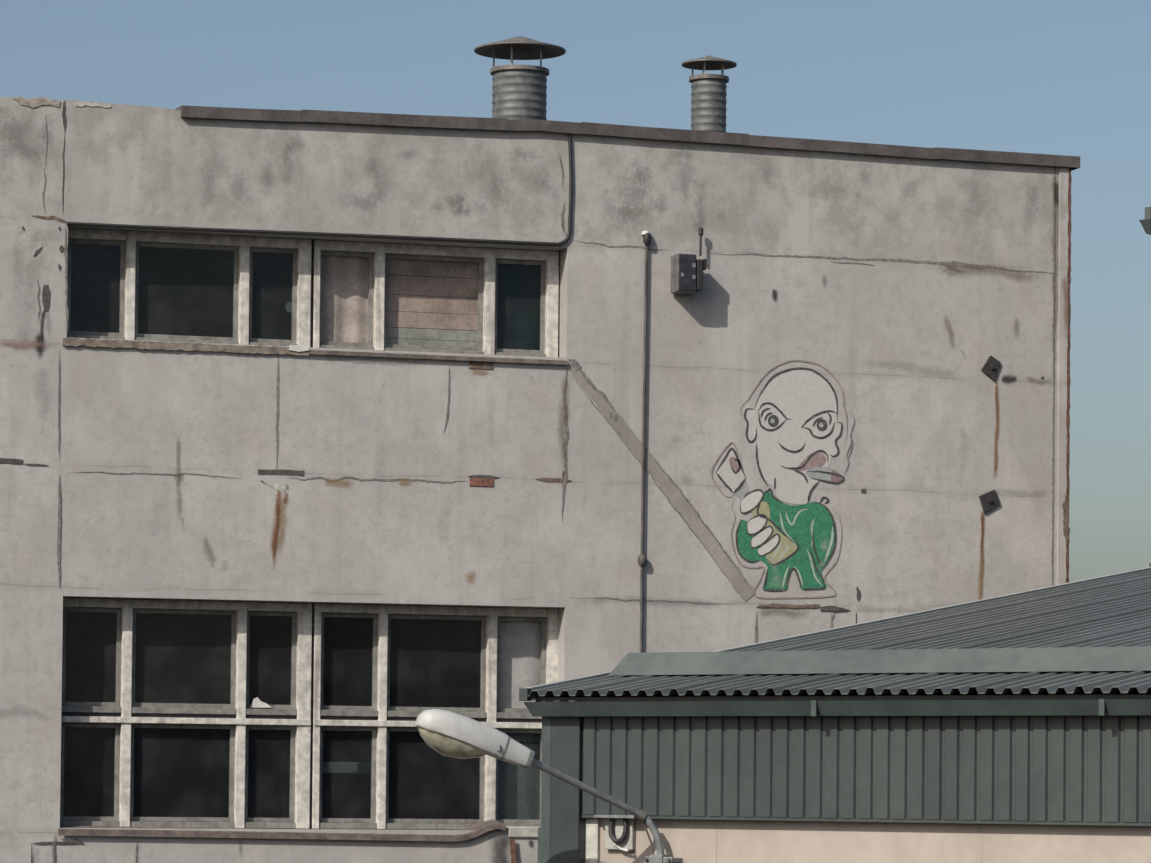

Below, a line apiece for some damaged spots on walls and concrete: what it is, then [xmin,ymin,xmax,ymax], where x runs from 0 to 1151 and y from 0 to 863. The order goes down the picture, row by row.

corrosion [272,492,287,558]
water stain [494,838,507,863]